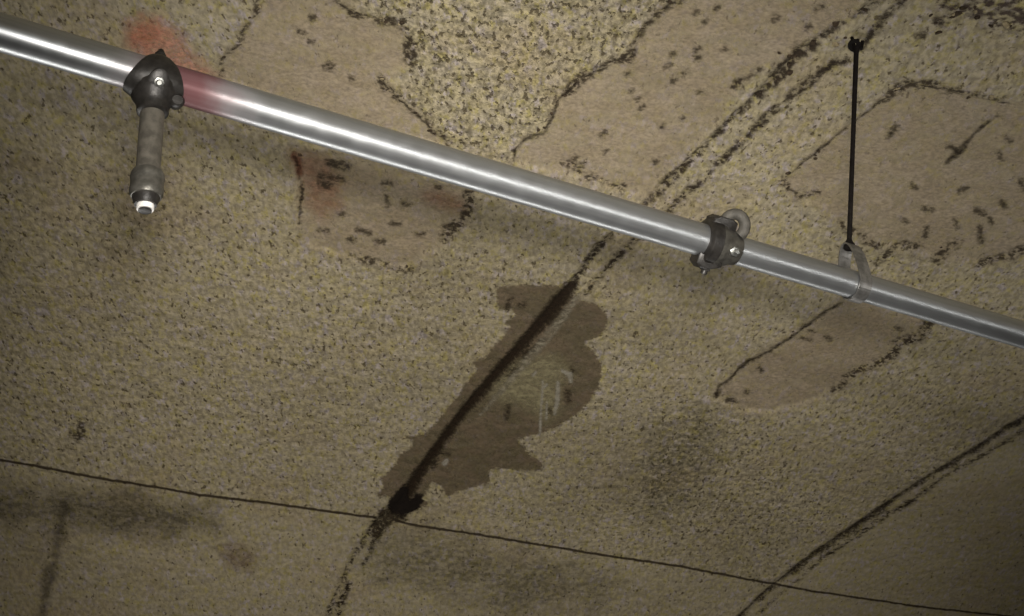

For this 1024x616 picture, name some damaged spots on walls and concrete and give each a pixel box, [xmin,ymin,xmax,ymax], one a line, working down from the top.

corrosion [132,21,202,72]
crack [643,0,907,212]
crack [946,121,990,164]
leakage [378,285,607,508]
crack [0,234,1024,616]